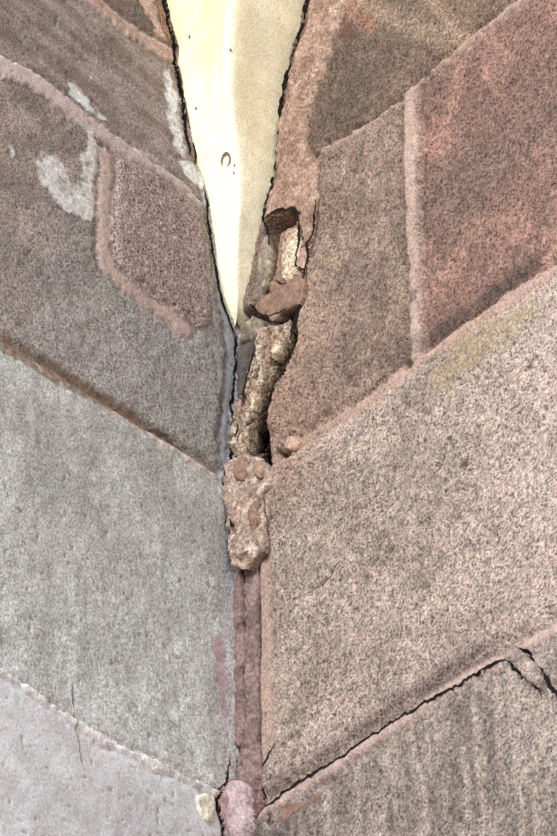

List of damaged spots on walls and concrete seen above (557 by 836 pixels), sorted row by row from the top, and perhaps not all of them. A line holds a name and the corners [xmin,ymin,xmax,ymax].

leakage [35,123,98,221]
leakage [69,83,106,120]
crack [162,0,197,162]
leakage [163,71,204,189]
crack [262,0,316,279]
crack [20,331,181,450]
crack [203,186,238,460]
spalling [222,225,312,571]
crack [250,304,304,339]
crack [212,565,557,836]